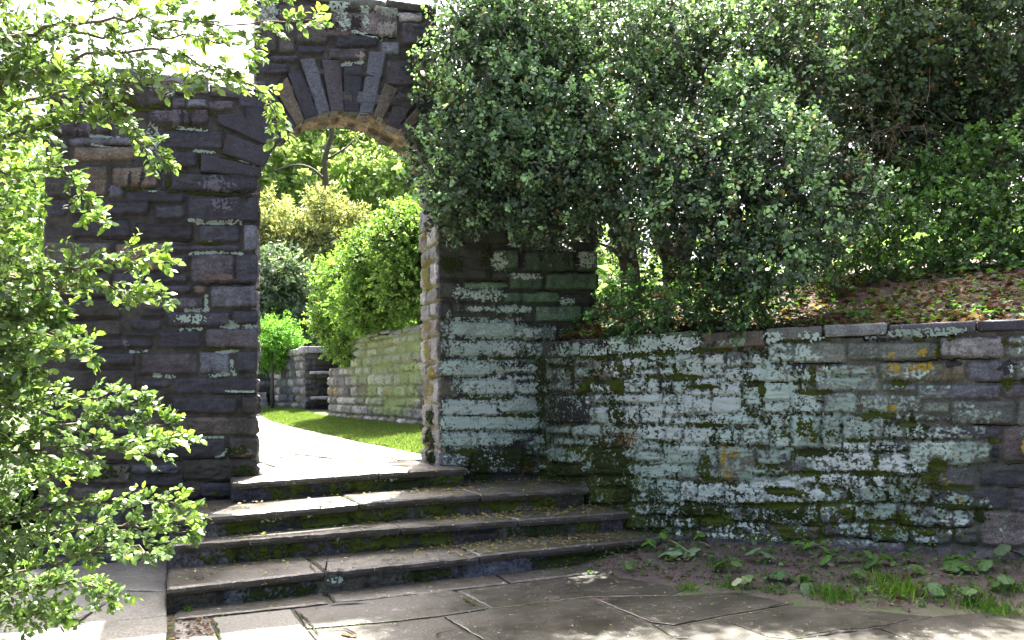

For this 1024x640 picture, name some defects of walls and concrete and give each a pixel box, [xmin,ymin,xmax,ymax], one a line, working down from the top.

damp [942,335,978,368]
damp [996,336,1017,376]
damp [554,390,592,429]